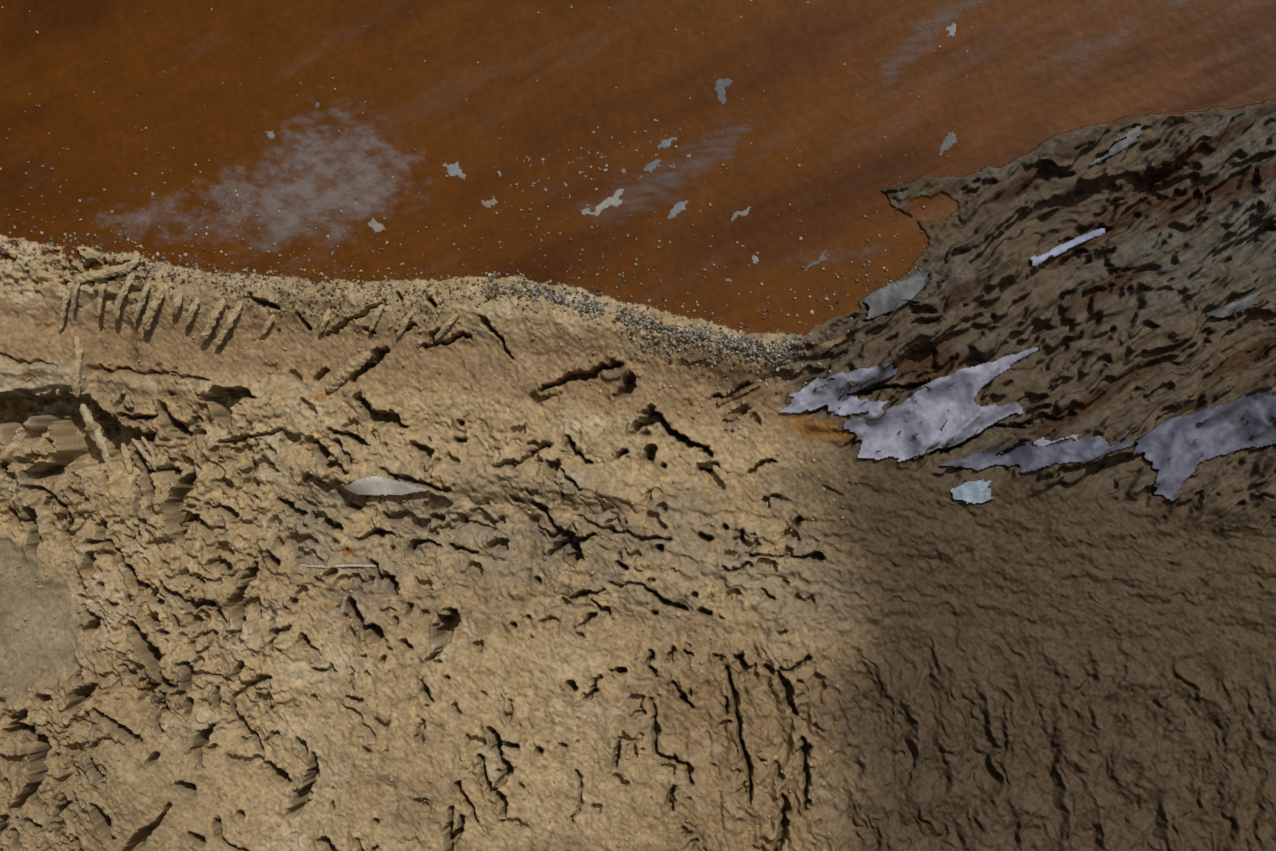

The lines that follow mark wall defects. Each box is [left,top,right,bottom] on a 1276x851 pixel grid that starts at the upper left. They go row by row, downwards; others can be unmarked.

peeling [1030,228,1105,266]
crack [0,352,212,384]
peeling [780,347,1276,504]
spalling [381,472,452,494]
crack [578,515,673,544]
crack [608,581,689,613]
crack [228,675,280,755]
crack [650,702,695,790]
crack [722,666,755,809]
crack [124,802,173,851]
crack [212,815,249,851]
crack [443,806,465,851]